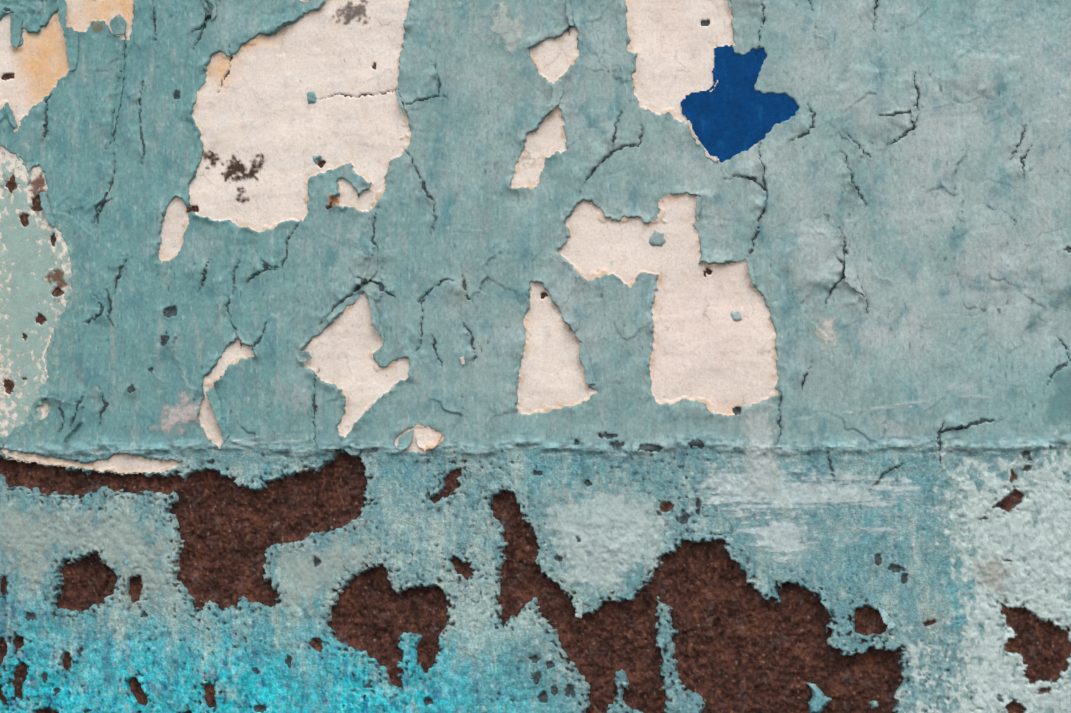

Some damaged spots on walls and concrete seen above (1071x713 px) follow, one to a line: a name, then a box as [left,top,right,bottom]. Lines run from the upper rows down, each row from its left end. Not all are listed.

peeling [159,0,411,262]
crack [585,112,643,181]
peeling [626,0,799,163]
crack [733,155,768,254]
crack [842,73,920,206]
crack [226,221,301,350]
crack [320,216,470,366]
peeling [558,193,779,416]
spalling [0,143,368,617]
crack [937,419,994,468]
spalling [491,491,908,713]
spalling [1000,603,1071,695]